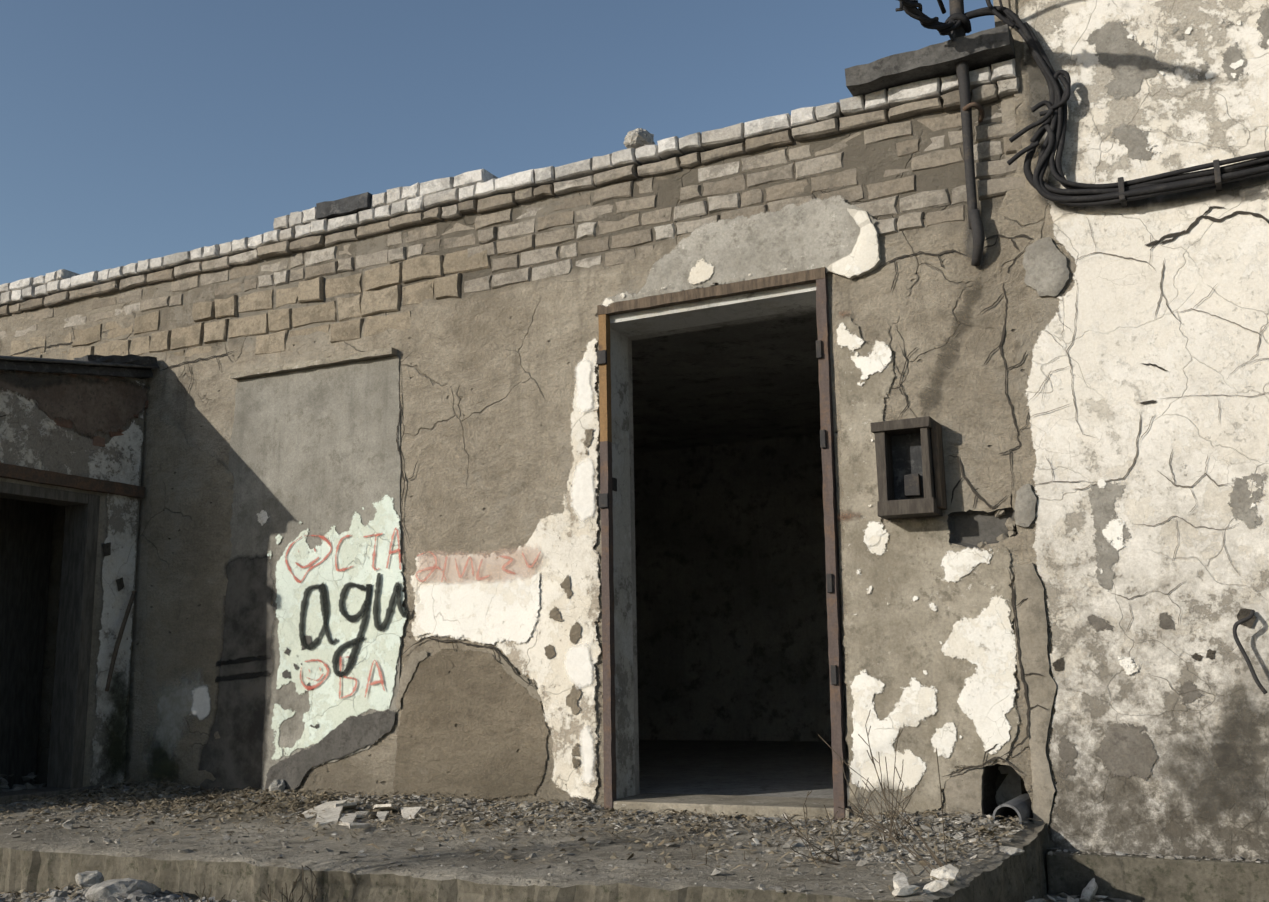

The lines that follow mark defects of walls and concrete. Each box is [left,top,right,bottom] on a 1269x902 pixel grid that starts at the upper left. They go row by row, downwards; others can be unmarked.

peeling [1112,123,1161,162]
peeling [1086,19,1193,100]
peeling [1197,41,1248,81]
peeling [601,195,882,306]
crack [396,366,418,545]
crack [880,206,1269,631]
spalling [0,370,235,803]
peeling [267,338,601,839]
peeling [830,315,1020,865]
crack [942,570,1046,777]
crack [1152,675,1215,725]
damp [1189,702,1269,817]